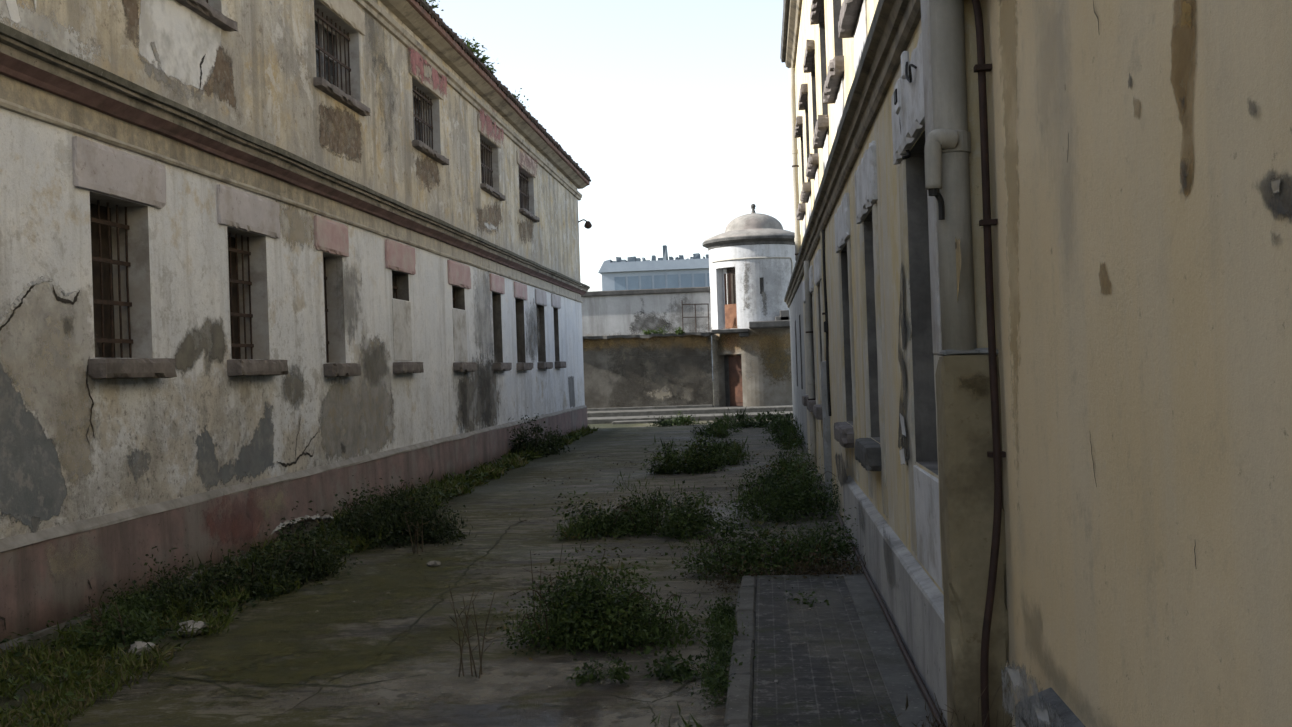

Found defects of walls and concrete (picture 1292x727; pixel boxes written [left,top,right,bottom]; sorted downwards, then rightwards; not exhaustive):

peeling [0,0,101,64]
spalling [122,0,236,107]
peeling [0,275,80,334]
crack [86,365,95,446]